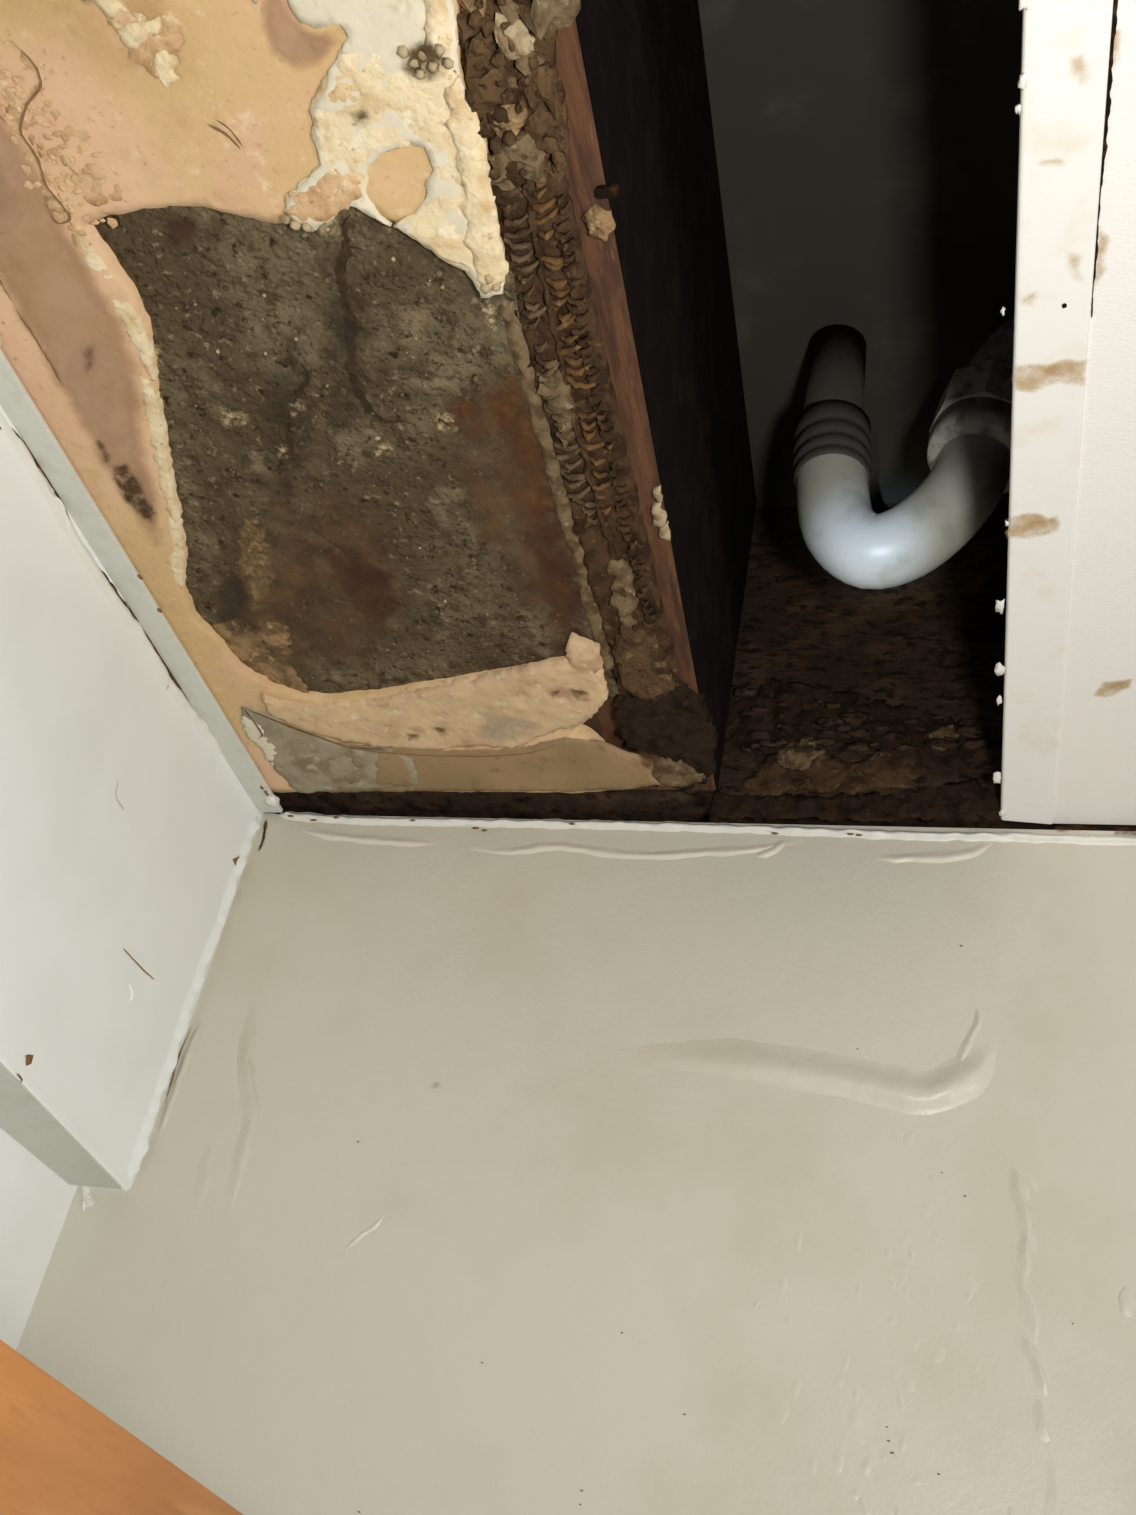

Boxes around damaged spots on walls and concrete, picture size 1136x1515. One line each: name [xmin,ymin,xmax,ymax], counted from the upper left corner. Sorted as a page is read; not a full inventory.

peeling [1015,71,1027,116]
spalling [0,0,667,793]
peeling [659,521,671,541]
peeling [995,599,1005,614]
peeling [994,662,1005,676]
peeling [127,677,1136,1183]